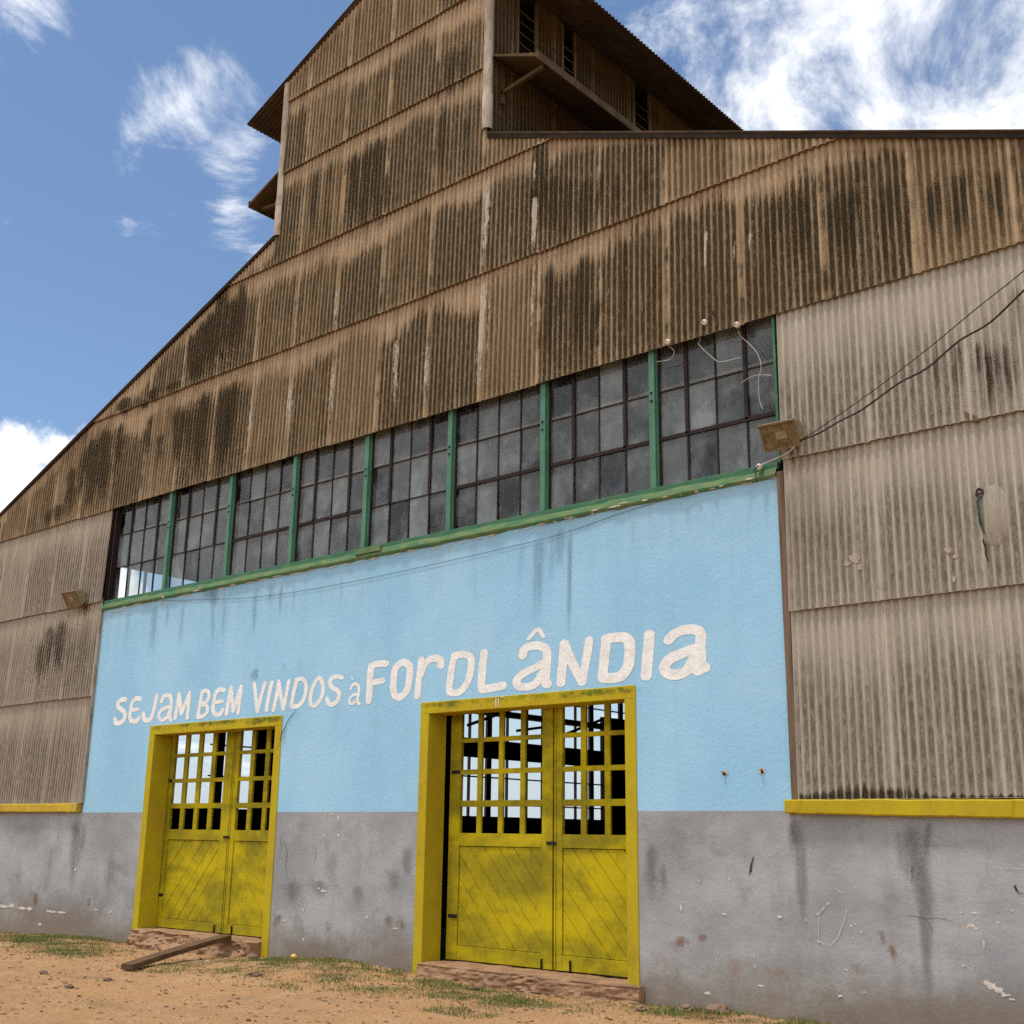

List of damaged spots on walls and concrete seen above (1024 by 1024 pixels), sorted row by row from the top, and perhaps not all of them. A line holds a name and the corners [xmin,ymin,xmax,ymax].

leakage [348,141,388,232]
leakage [530,143,602,245]
leakage [766,196,810,251]
leakage [828,189,858,259]
leakage [927,173,968,235]
leakage [989,173,1003,218]
leakage [187,285,247,380]
efflorescence [476,283,490,370]
leakage [531,255,599,351]
leakage [976,344,1012,400]
leakage [45,381,237,523]
peeling [982,980,1015,1000]